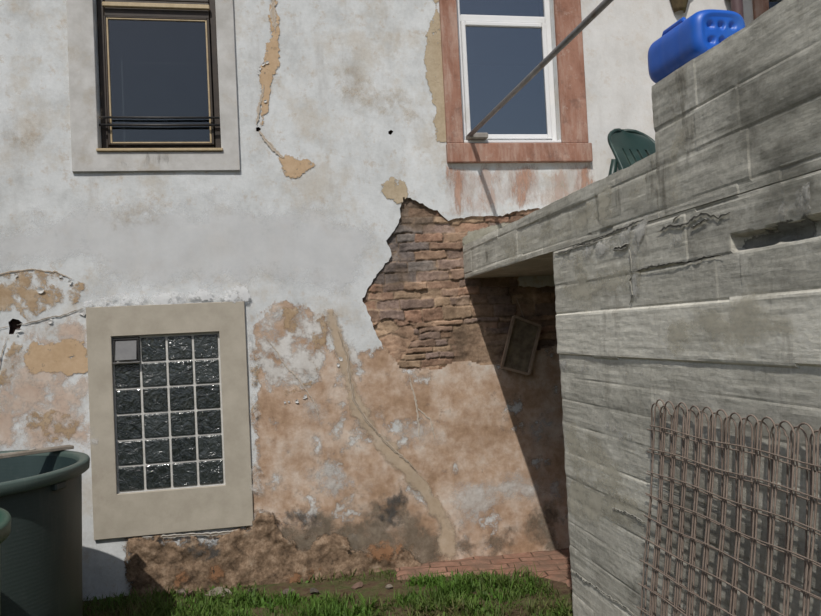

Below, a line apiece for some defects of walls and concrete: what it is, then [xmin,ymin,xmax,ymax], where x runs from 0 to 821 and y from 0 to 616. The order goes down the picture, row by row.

peeling [256,0,314,179]
peeling [424,0,446,142]
crack [553,211,730,305]
peeling [0,269,90,449]
peeling [123,177,570,598]
crack [339,334,415,470]
leakage [280,491,442,564]